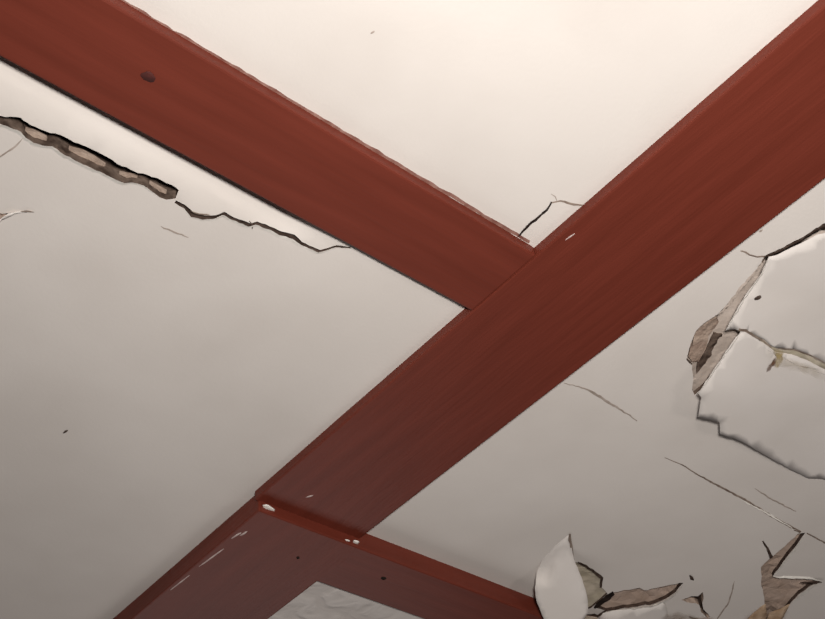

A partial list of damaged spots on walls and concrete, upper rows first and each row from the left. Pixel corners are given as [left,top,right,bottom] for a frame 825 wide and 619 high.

peeling [0,210,33,222]
crack [0,116,351,254]
crack [518,194,583,237]
peeling [686,223,825,479]
crack [666,458,825,544]
peeling [535,534,607,619]